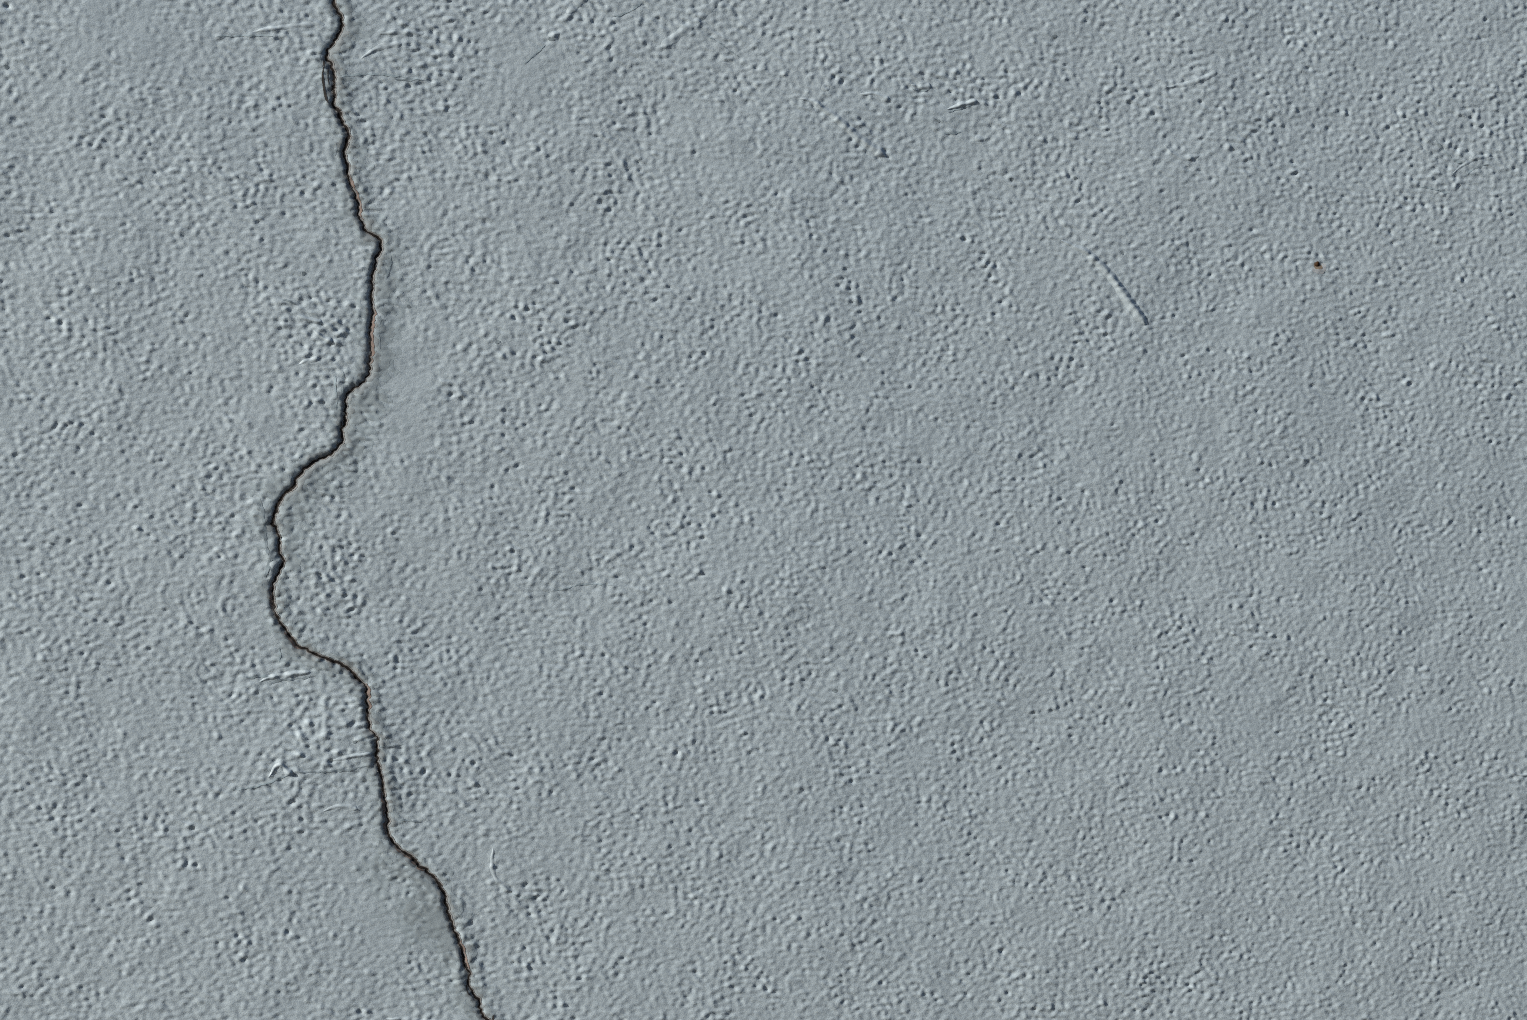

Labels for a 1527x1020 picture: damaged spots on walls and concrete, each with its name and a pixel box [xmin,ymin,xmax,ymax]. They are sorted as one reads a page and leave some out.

crack [232,0,495,1020]